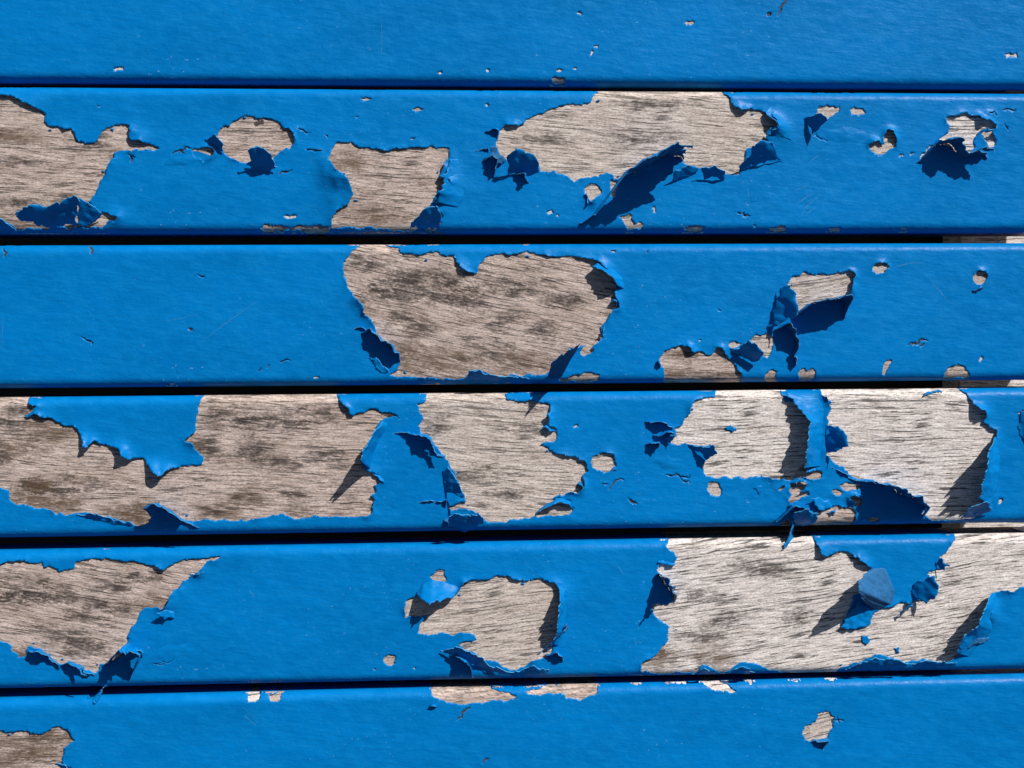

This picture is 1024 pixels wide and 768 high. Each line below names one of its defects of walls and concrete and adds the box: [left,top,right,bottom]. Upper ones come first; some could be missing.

peeling [0,95,159,234]
peeling [193,115,294,172]
peeling [620,214,644,233]
peeling [474,91,791,224]
peeling [869,113,996,164]
peeling [0,138,624,533]
peeling [631,270,1024,693]
peeling [0,556,220,704]
peeling [404,570,600,707]
peeling [0,726,74,768]
peeling [802,711,834,751]